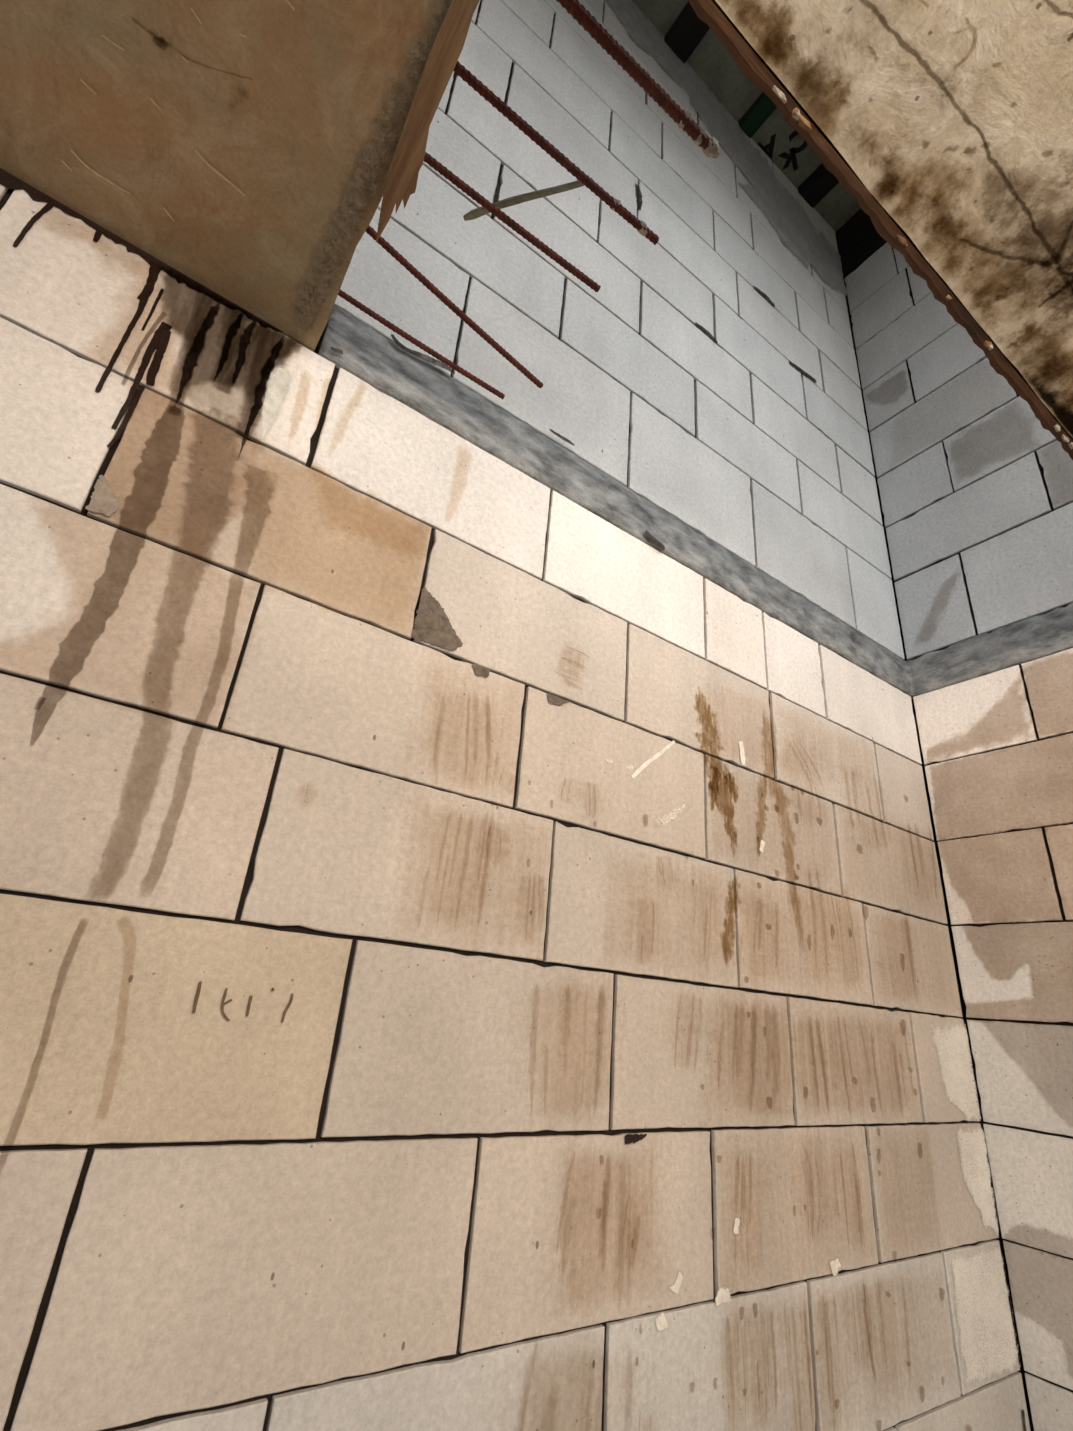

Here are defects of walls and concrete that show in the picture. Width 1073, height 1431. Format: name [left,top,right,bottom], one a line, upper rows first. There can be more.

damp [12,200,57,247]
spalling [424,151,601,292]
spalling [453,61,659,245]
crack [861,0,1073,307]
damp [95,263,172,447]
damp [176,304,293,453]
spalling [366,225,543,388]